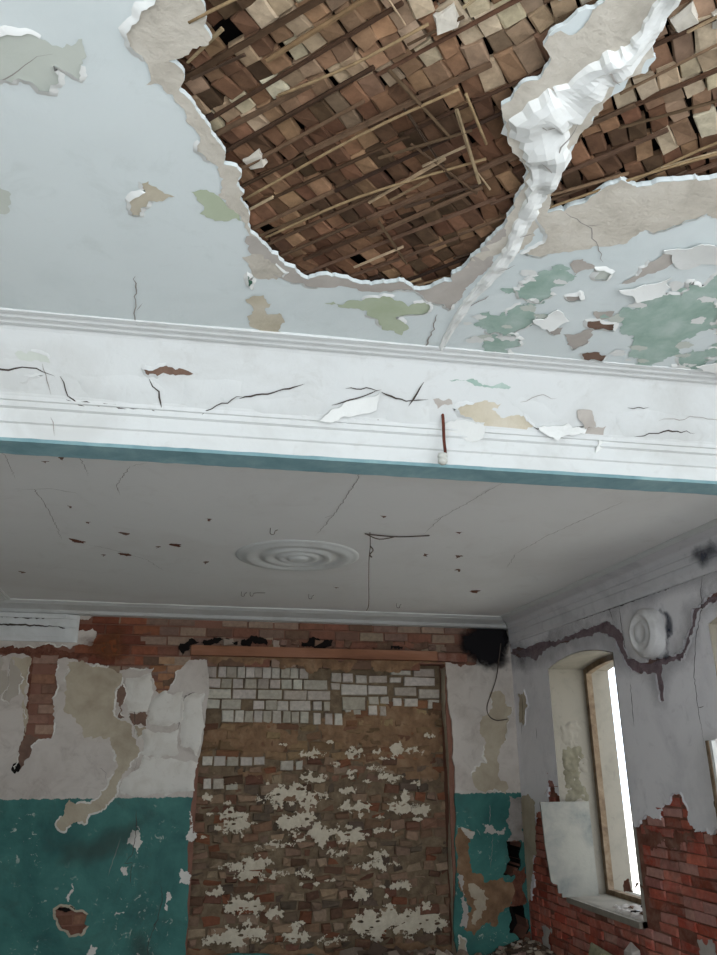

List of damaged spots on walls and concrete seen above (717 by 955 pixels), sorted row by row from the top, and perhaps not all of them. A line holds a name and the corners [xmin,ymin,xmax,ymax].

crack [3,54,51,80]
peeling [0,25,87,96]
spalling [118,0,656,335]
spalling [463,0,717,374]
crack [203,384,303,414]
spalling [320,392,381,425]
spalling [433,398,613,453]
crack [577,571,716,741]
spalling [0,616,476,833]
spalling [186,811,197,842]
spalling [455,688,717,955]
spalling [53,883,89,937]